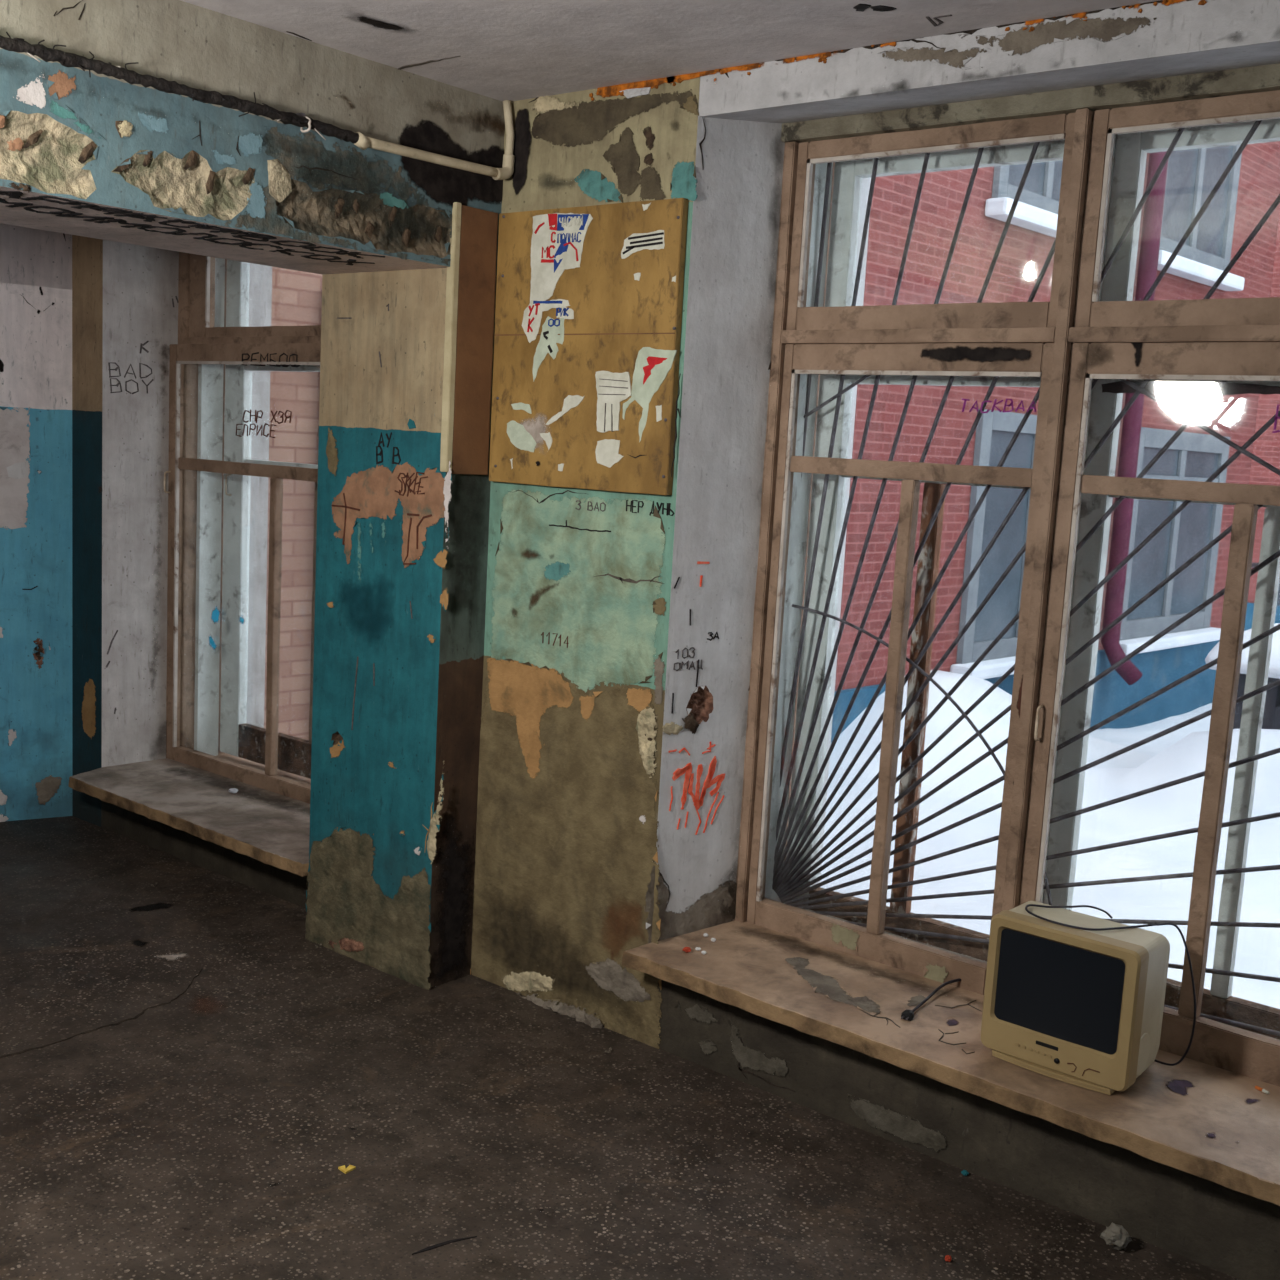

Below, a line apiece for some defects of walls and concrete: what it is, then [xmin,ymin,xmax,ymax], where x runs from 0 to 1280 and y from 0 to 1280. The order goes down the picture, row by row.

corrosion [783,50,843,64]
peeling [877,16,1156,69]
corrosion [1005,17,1055,32]
corrosion [1122,0,1207,13]
flaking render [0,70,169,199]
flaking render [111,125,452,266]
leakage [471,112,505,135]
peeling [326,426,452,581]
peeling [470,489,737,1049]
peeling [305,761,445,990]
leakage [434,814,475,982]
crack [0,969,202,1058]